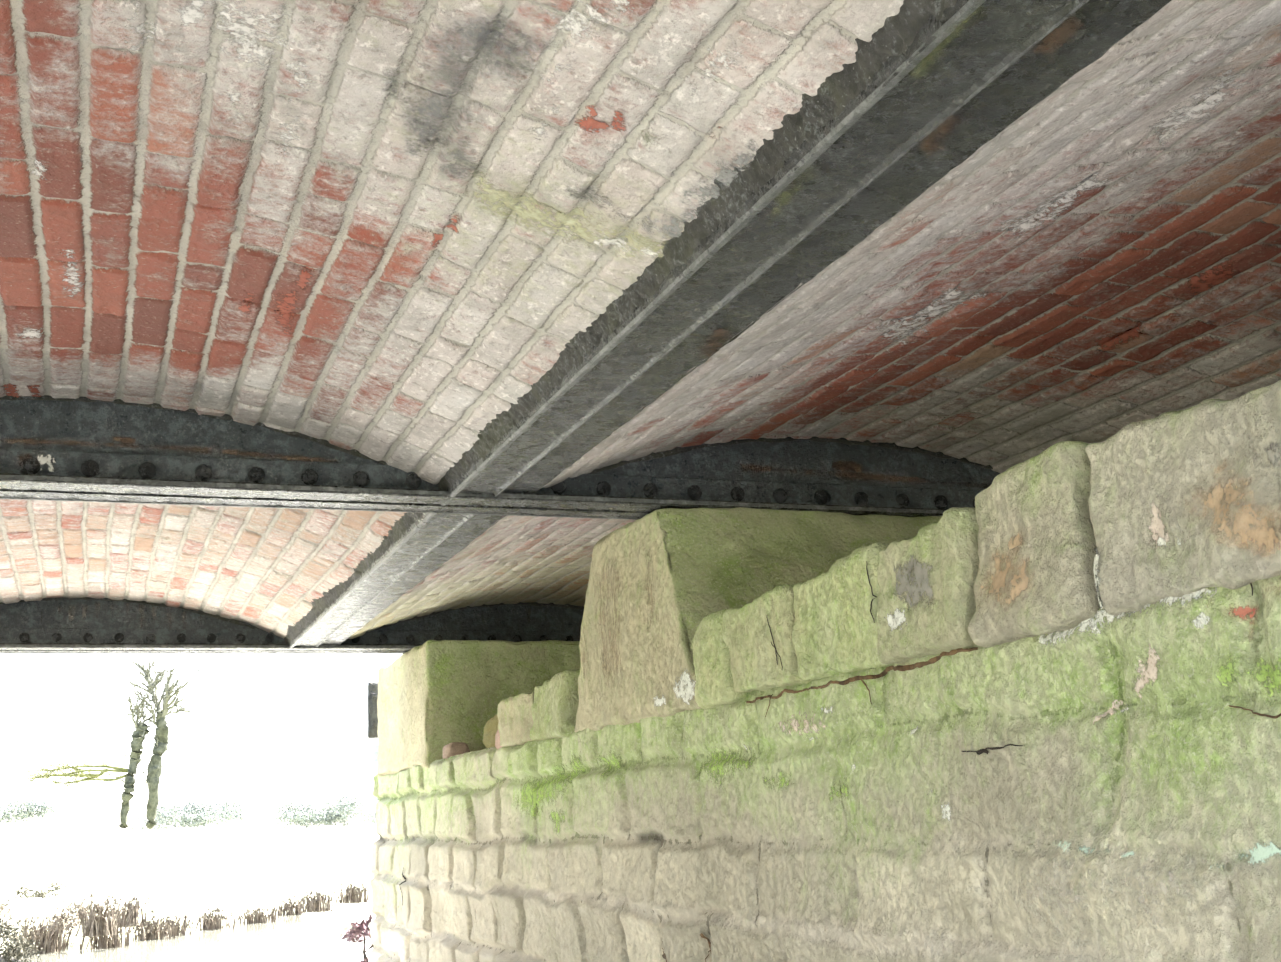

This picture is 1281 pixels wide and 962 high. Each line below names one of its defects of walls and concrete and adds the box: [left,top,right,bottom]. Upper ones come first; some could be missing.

water stain [548,0,629,38]
spalling [575,106,626,133]
water stain [407,122,757,257]
corrosion [1204,467,1281,555]
corrosion [980,533,1028,604]
crack [746,614,978,717]
crack [1229,705,1281,719]
crack [962,744,1023,755]